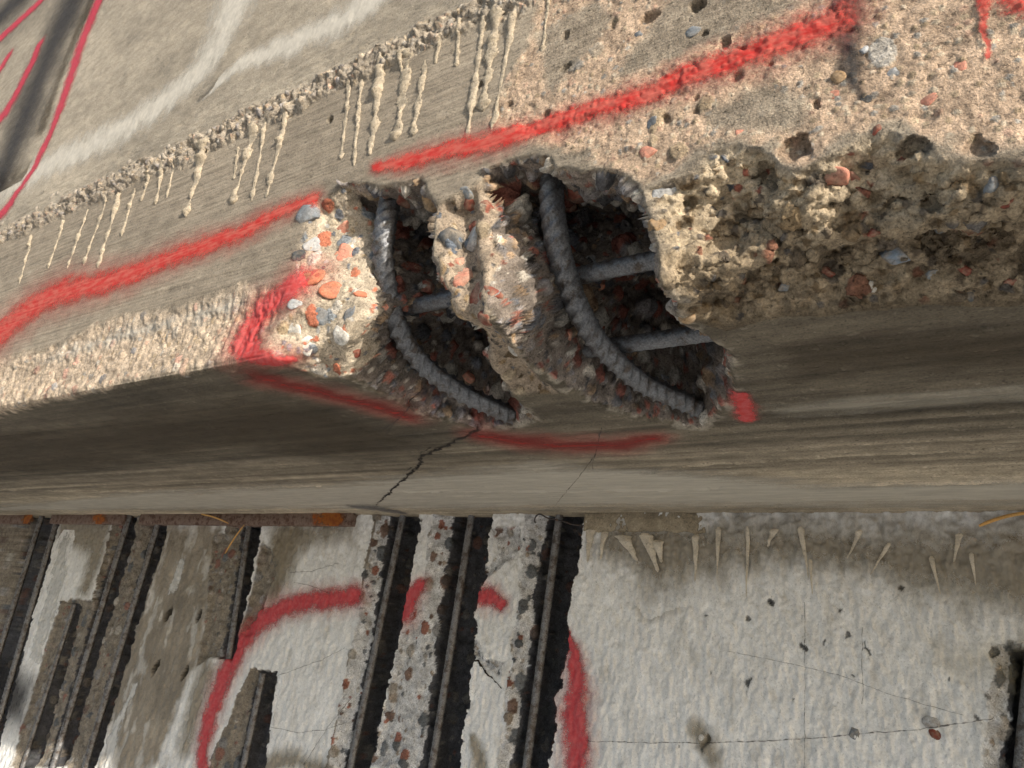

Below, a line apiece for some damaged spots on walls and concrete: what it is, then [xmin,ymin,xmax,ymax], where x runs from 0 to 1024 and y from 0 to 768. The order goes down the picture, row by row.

leakage [0,0,383,203]
spalling [0,0,1024,429]
spalling [0,515,59,728]
spalling [11,515,169,768]
spalling [240,673,267,768]
spalling [347,515,407,768]
spalling [371,616,416,768]
crack [374,427,481,508]
spalling [428,515,475,768]
spalling [485,526,523,577]
spalling [522,514,563,768]
leakage [606,526,1024,606]